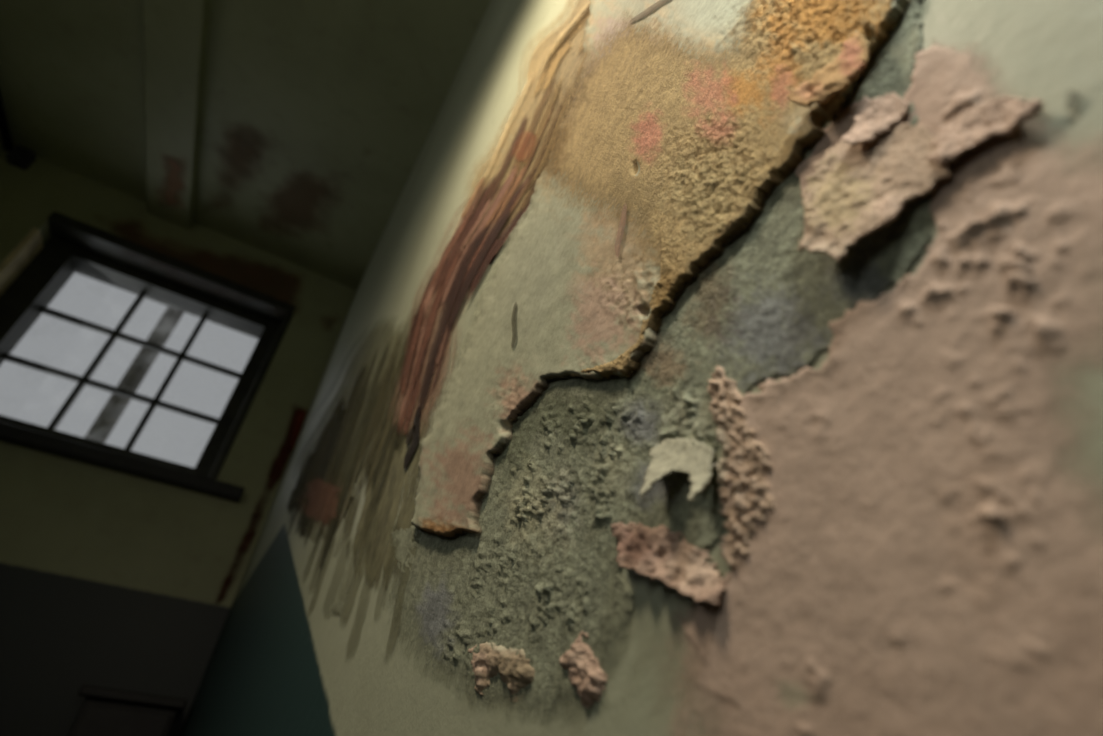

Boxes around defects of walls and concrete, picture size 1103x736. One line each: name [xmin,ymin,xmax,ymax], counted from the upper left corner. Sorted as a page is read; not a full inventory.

flaking render [557,0,753,129]
flaking render [411,145,663,539]
flaking render [611,0,1103,736]
peeling [468,642,535,703]
peeling [559,631,608,709]